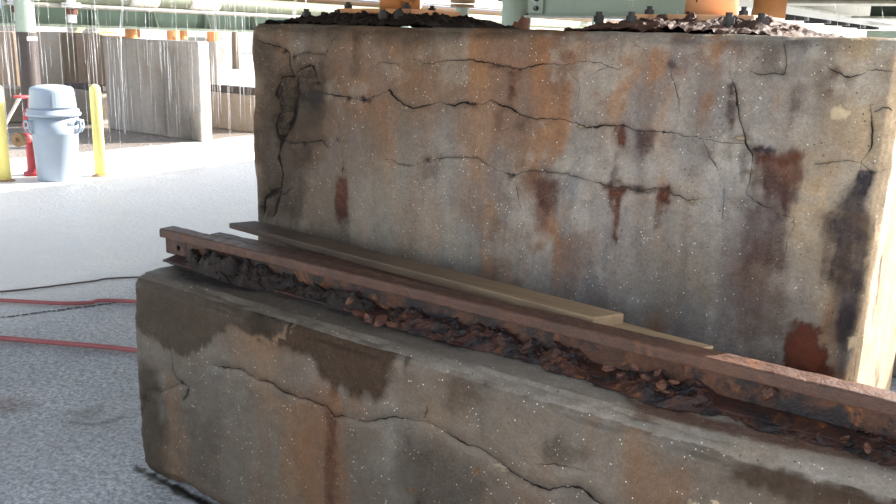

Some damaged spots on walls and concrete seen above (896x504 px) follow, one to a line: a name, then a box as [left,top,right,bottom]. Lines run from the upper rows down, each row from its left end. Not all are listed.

corrosion [335,178,348,222]
crack [258,40,795,256]
corrosion [604,184,626,241]
corrosion [754,146,802,212]
crack [820,105,893,178]
water stain [831,170,874,343]
crack [136,328,190,410]
water stain [135,278,410,401]
corrosion [784,320,833,377]
crack [216,365,601,504]
corrosion [631,400,860,458]
crack [134,465,212,504]